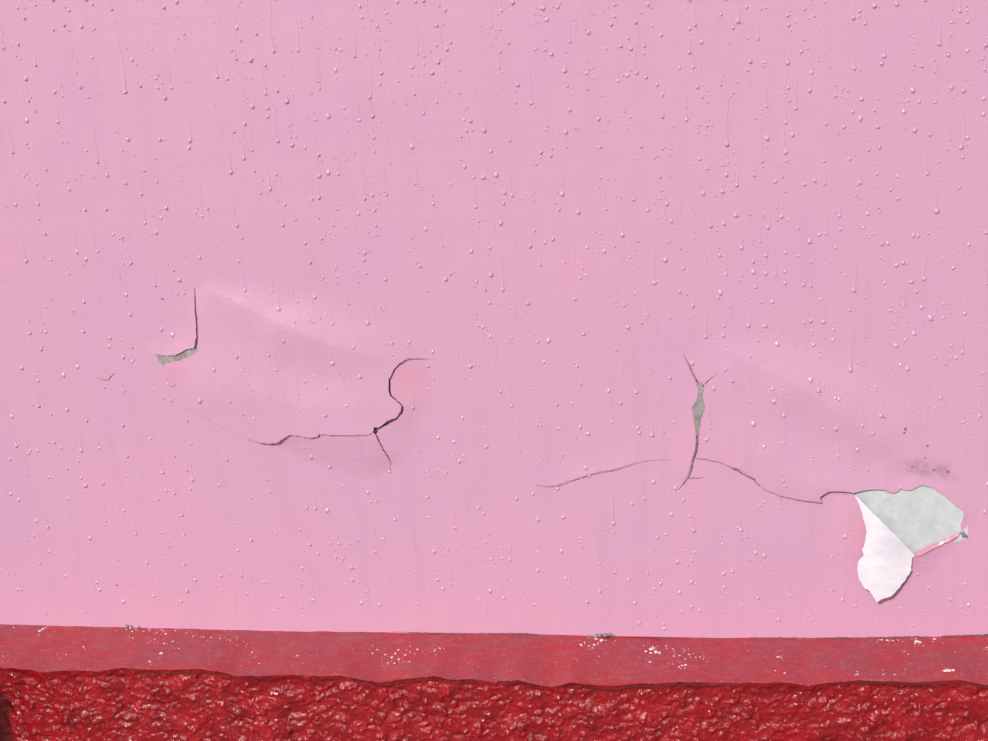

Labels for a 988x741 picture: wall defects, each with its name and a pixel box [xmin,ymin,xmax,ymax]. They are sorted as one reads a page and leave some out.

crack [661,356,717,489]
peeling [687,329,979,602]